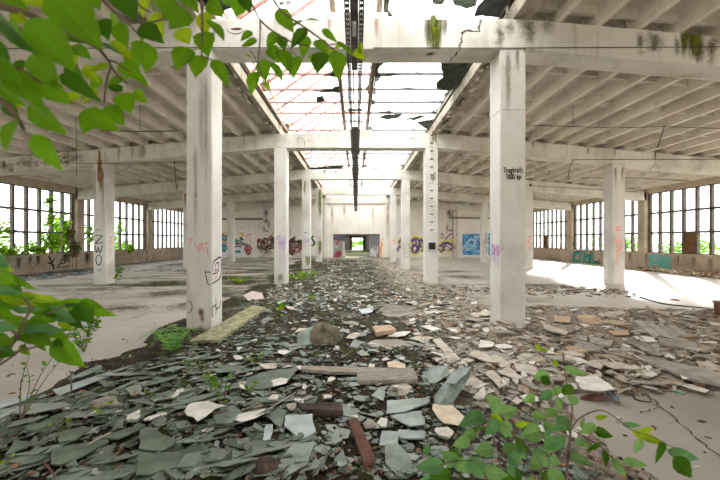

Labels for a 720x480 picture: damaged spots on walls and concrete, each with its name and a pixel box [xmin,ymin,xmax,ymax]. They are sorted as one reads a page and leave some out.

water stain [425,19,447,49]
crack [448,17,482,63]
water stain [675,33,717,61]
crack [640,396,720,456]